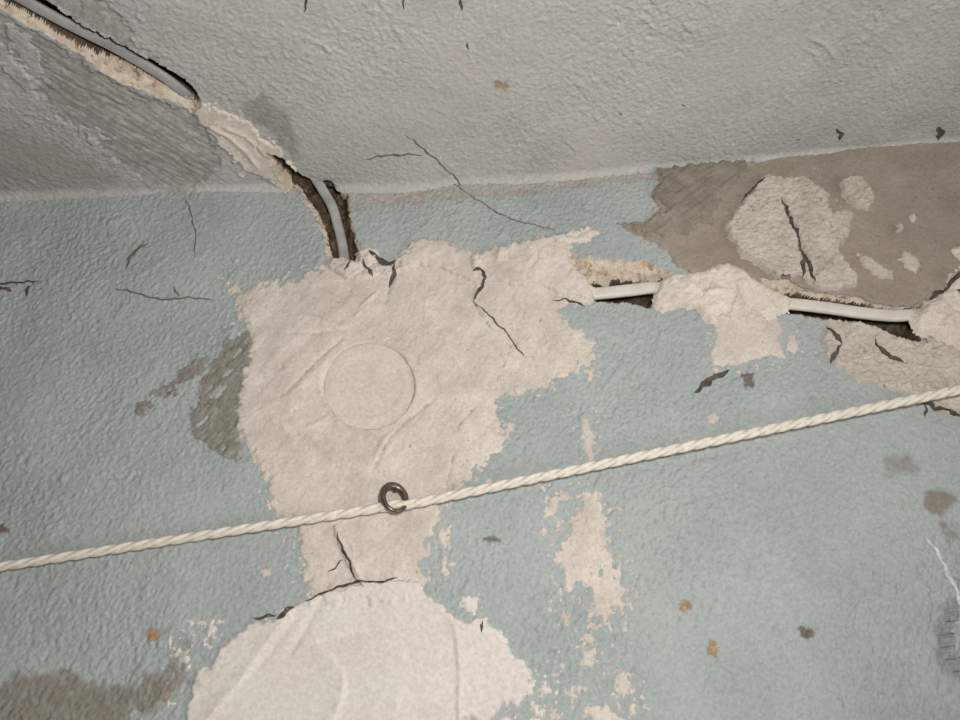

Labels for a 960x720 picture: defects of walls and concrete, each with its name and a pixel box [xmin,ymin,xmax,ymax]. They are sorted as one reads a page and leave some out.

peeling [0,23,44,91]
crack [185,198,196,253]
flaking render [568,141,960,309]
crack [0,280,38,297]
damp [135,354,209,416]
peeling [570,404,601,463]
crack [923,402,960,417]
crack [252,531,396,620]
peeling [459,593,482,616]
peeling [500,480,650,720]
damp [0,664,180,720]
peeling [156,618,224,707]